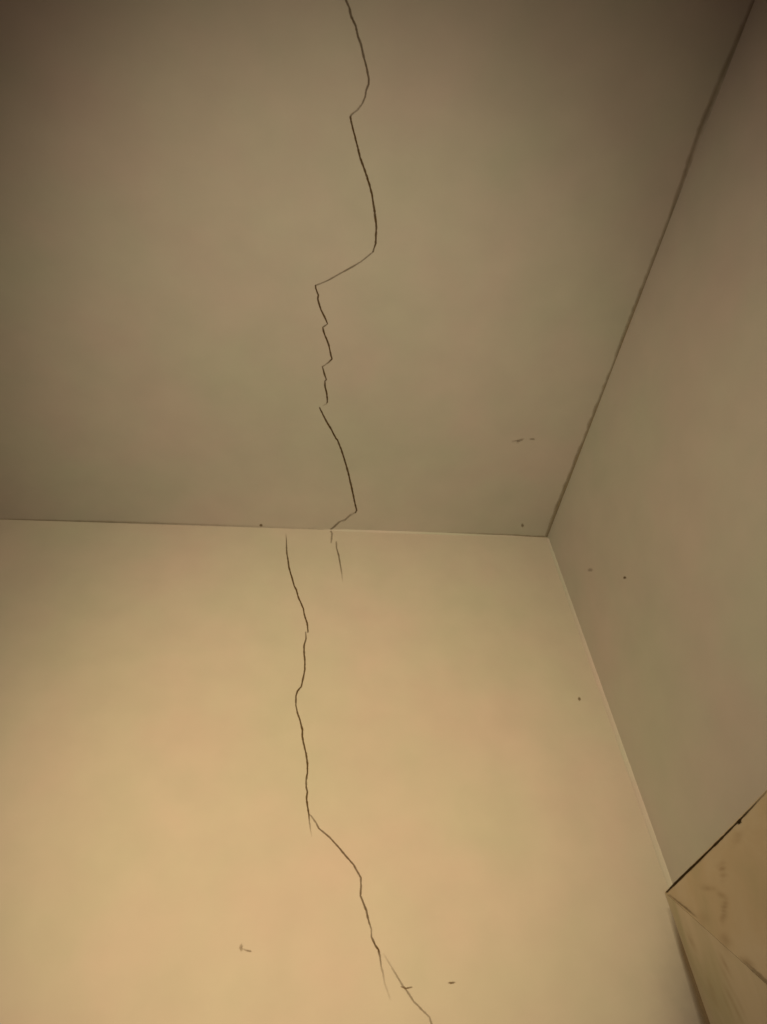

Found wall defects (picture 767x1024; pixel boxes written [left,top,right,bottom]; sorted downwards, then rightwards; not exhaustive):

crack [345,0,369,95]
crack [350,116,377,251]
crack [315,285,357,513]
crack [286,541,380,955]